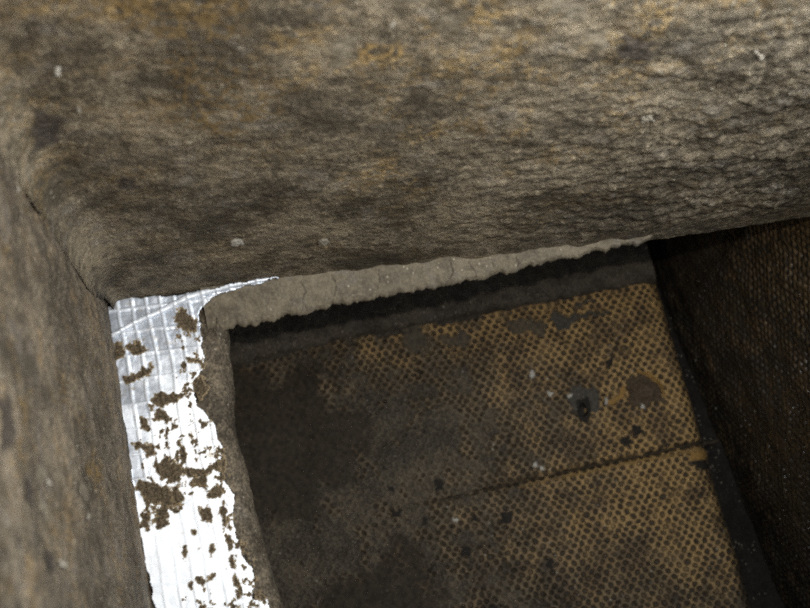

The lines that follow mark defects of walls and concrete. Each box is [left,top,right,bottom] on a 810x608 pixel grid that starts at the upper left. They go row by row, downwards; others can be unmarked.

damp [232,367,371,519]